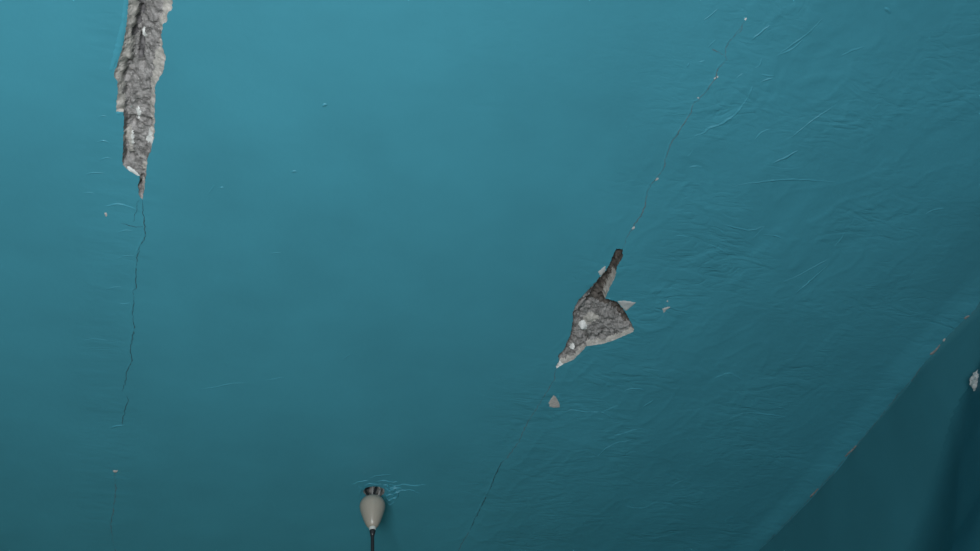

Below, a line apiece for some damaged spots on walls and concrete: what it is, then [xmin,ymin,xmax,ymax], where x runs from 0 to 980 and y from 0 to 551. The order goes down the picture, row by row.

spalling [109,0,173,200]
crack [121,200,146,423]
spalling [556,249,636,368]